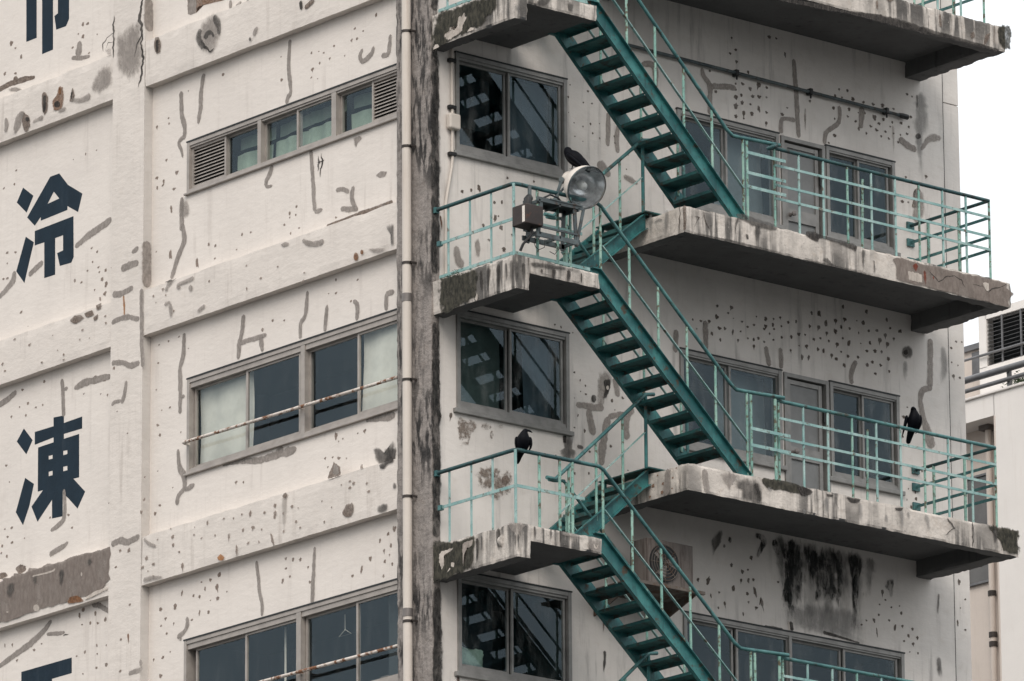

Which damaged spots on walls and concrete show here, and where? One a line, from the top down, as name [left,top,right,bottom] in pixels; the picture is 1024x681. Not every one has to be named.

crack [71,0,144,87]
leakage [695,214,776,252]
leakage [805,231,875,274]
leakage [430,0,583,681]
peeling [479,468,511,499]
mould [989,525,1020,554]
peeling [0,547,130,625]
leakage [756,533,862,636]